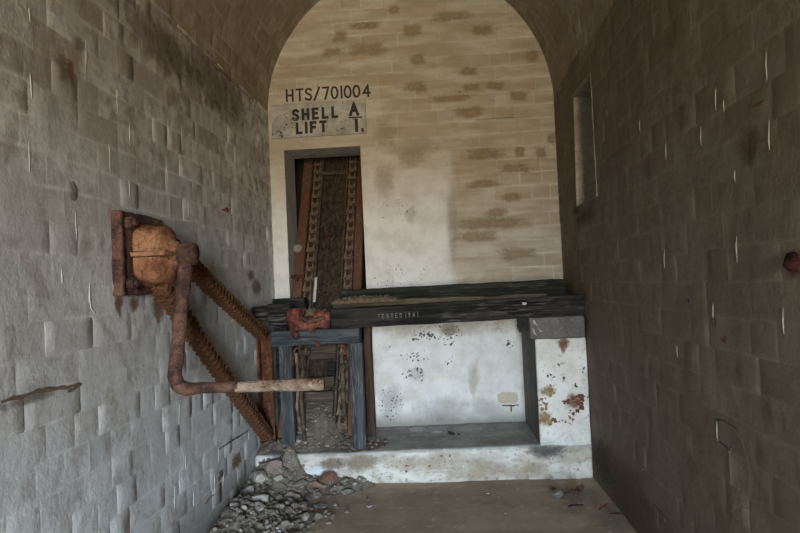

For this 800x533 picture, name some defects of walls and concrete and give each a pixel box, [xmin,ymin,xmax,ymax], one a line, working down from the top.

corrosion [115,297,138,316]
corrosion [153,297,163,323]